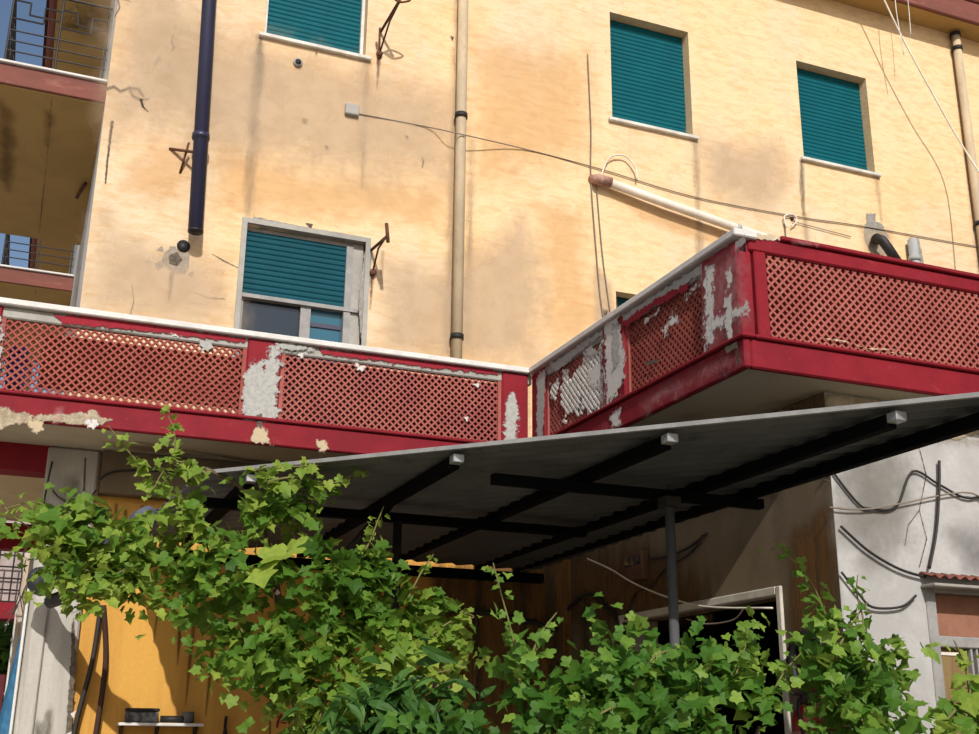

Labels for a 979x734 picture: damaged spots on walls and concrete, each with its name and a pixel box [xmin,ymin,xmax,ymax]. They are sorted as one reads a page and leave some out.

crack [105,85,150,112]
crack [105,121,114,184]
spalling [155,240,194,274]
peeling [53,314,246,351]
peeling [535,233,781,437]
spalling [0,407,113,434]
peeling [241,342,498,444]
peeling [503,392,520,440]